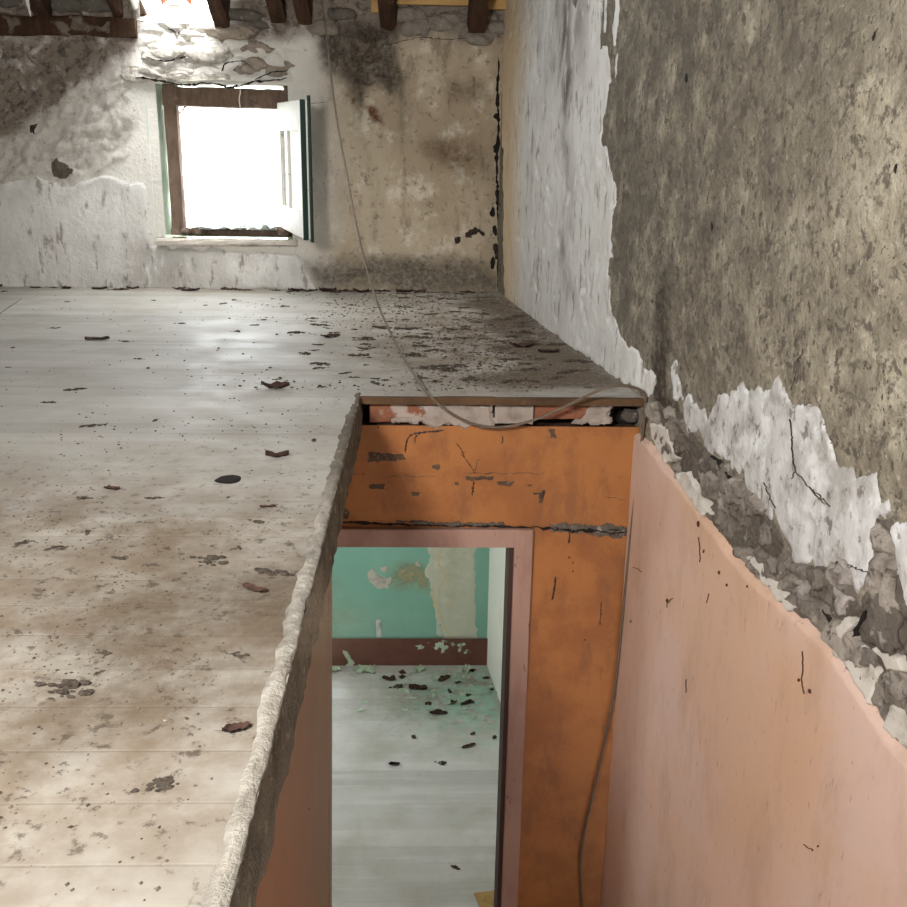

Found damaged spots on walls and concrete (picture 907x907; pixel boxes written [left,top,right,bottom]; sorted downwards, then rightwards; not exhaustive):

damp [320,26,399,94]
peeling [0,158,315,290]
spalling [454,227,485,244]
damp [313,259,495,290]
peeling [493,0,907,747]
peeling [368,452,406,462]
crack [789,419,831,507]
peeling [454,476,514,487]
peeling [396,519,505,527]
crack [343,521,619,533]
peeling [368,565,393,589]
peeling [414,547,478,674]